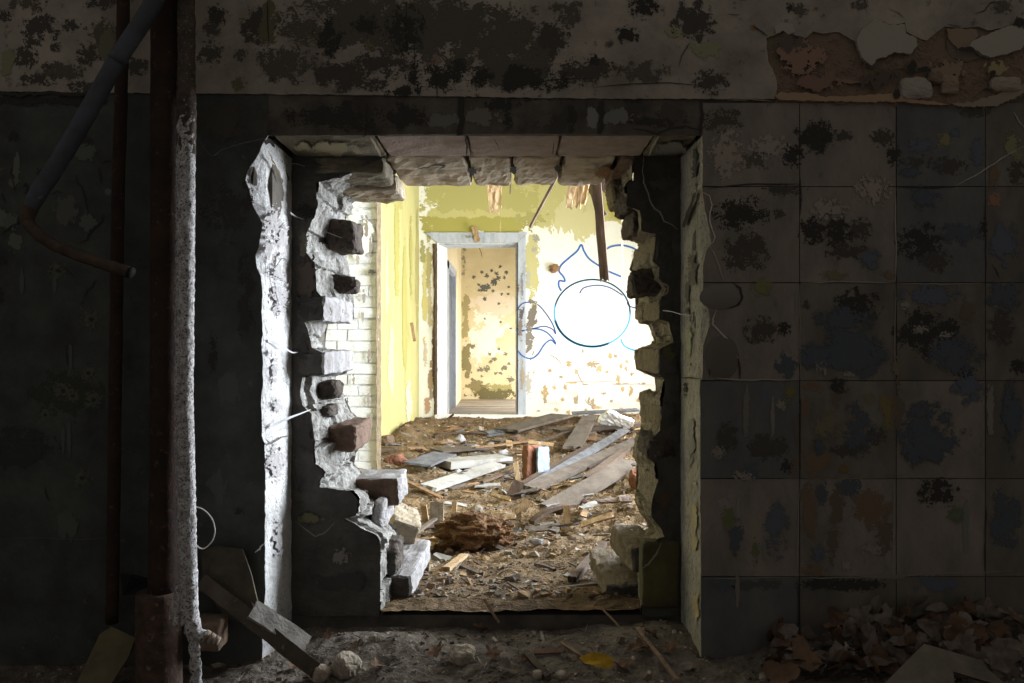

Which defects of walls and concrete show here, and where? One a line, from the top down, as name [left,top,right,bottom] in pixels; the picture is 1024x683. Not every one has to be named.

mould [0,0,116,107]
damp [195,0,744,143]
spalling [766,17,1024,108]
mould [741,118,853,171]
spalling [295,157,431,597]
spalling [420,235,434,414]
mould [461,248,510,349]
damp [467,299,538,399]
spalling [536,347,678,459]
spalling [605,178,675,325]
mould [710,182,808,275]
spalling [589,524,680,608]